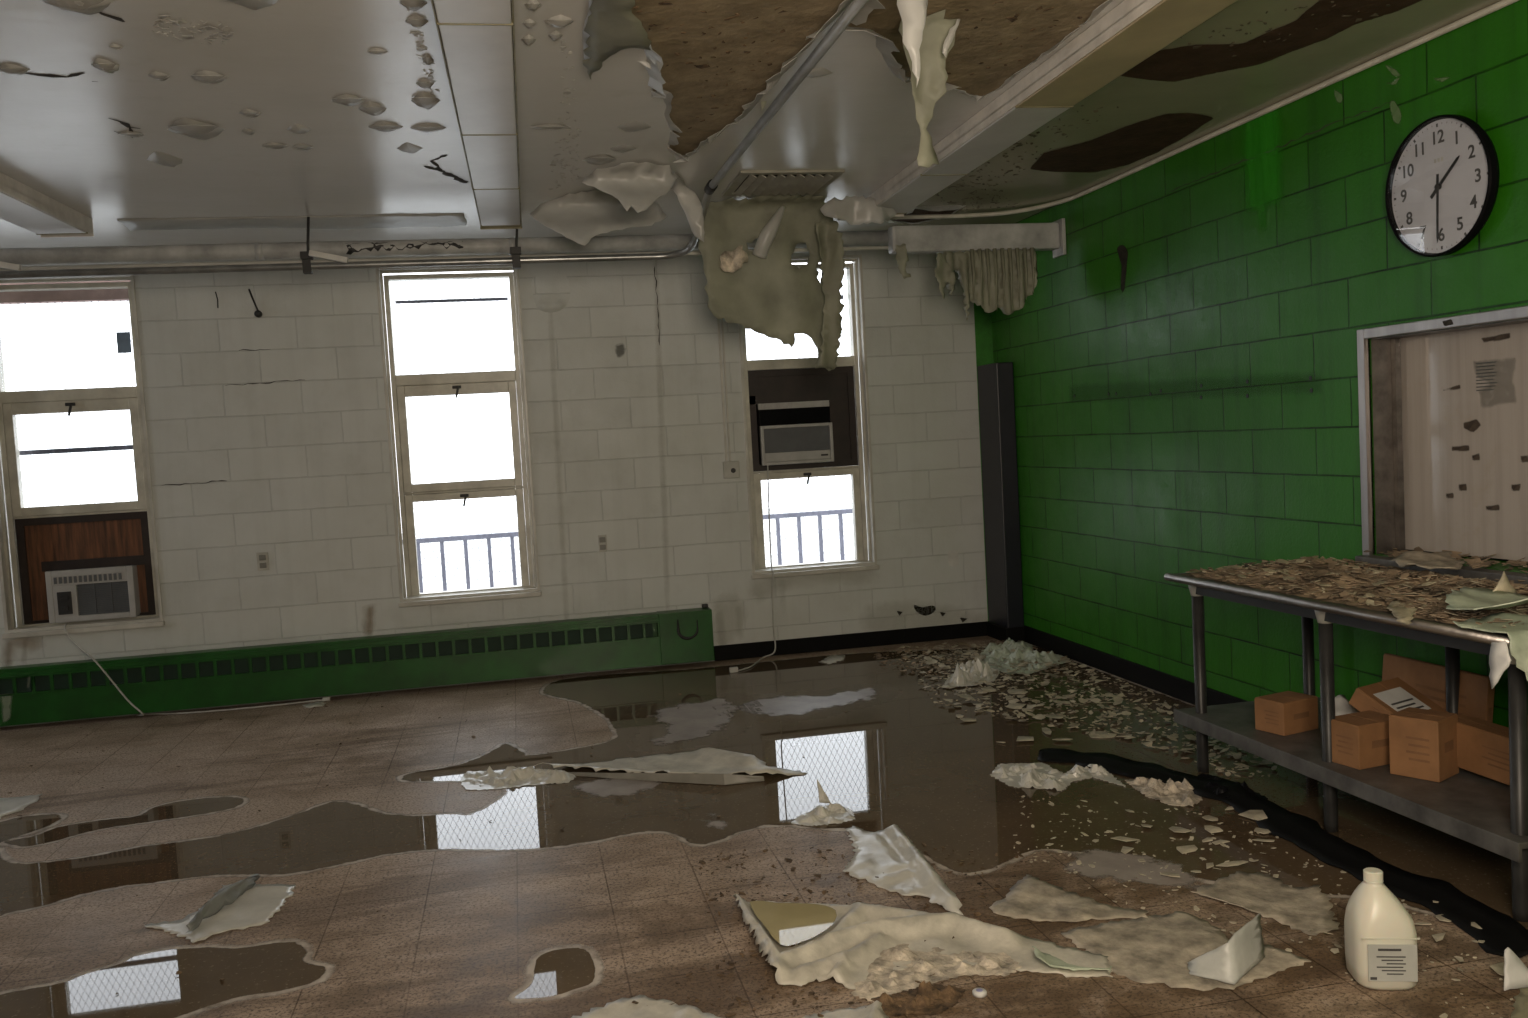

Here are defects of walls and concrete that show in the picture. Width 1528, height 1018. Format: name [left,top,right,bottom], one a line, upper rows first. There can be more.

peeling [406,8,439,98]
peeling [582,0,911,163]
peeling [926,0,1114,102]
peeling [1120,0,1422,82]
peeling [885,105,1213,224]